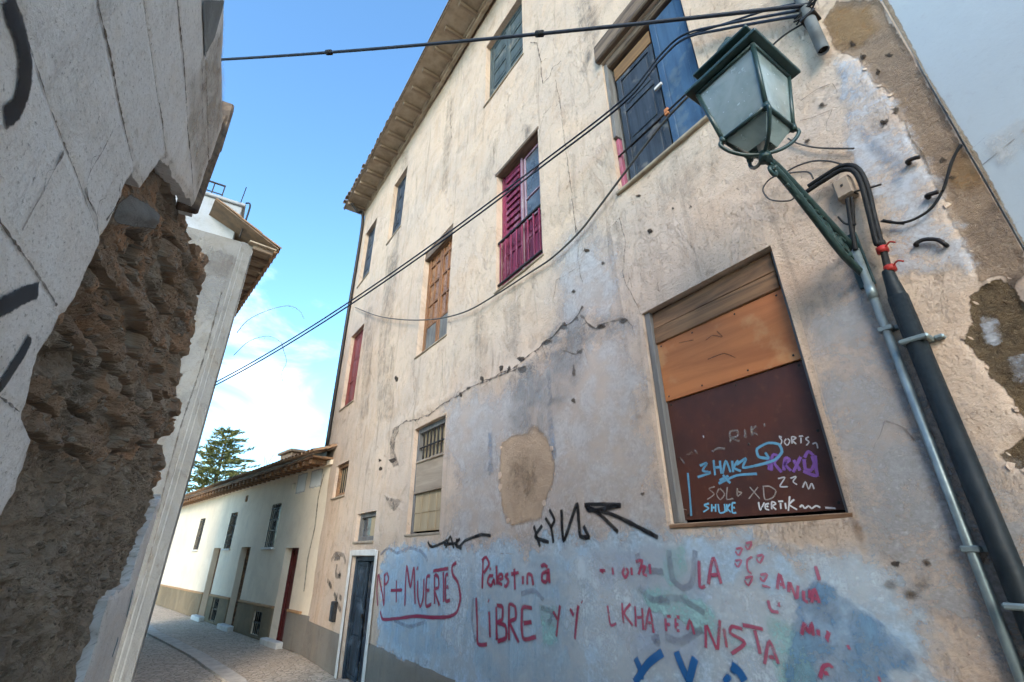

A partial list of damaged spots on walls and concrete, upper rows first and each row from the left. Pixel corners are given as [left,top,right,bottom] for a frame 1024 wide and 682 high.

crack [398,42,637,427]
spalling [823,0,1024,416]
spalling [498,427,555,526]